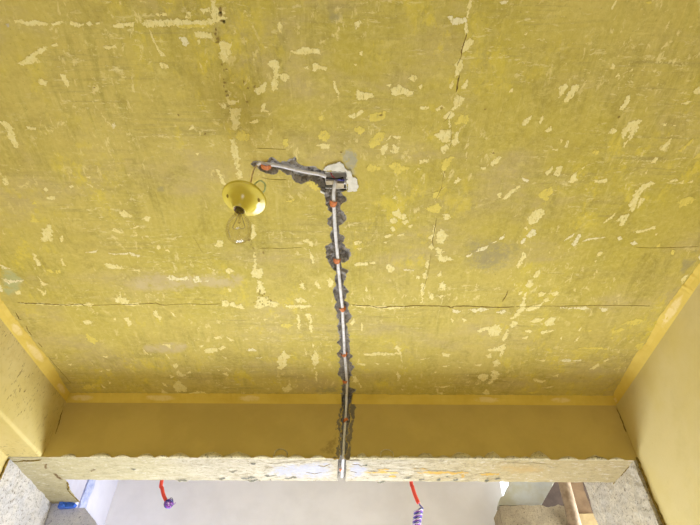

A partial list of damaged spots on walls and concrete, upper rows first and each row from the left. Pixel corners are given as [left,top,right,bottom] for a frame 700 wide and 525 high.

peeling [6,19,100,27]
peeling [113,0,232,69]
peeling [249,59,290,124]
peeling [386,75,423,97]
crack [456,34,467,92]
peeling [604,138,672,226]
peeling [516,186,553,268]
peeling [277,350,293,370]
peeling [469,270,559,395]
crack [575,301,637,309]
spalling [90,448,326,459]
spalling [350,449,624,461]